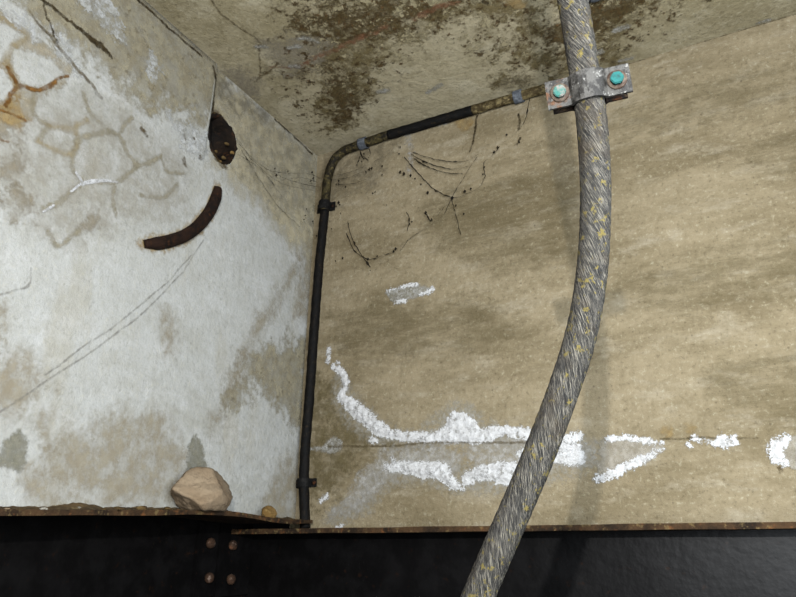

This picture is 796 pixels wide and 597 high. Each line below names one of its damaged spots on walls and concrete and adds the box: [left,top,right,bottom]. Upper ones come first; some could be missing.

crack [138,0,217,114]
damp [0,0,568,142]
damp [589,0,689,67]
crack [0,0,182,248]
corrosion [140,184,222,252]
damp [220,338,306,428]
damp [0,414,206,505]
damp [267,454,299,519]
damp [310,347,531,528]
damp [549,430,665,484]
damp [685,434,739,450]
damp [766,432,796,469]